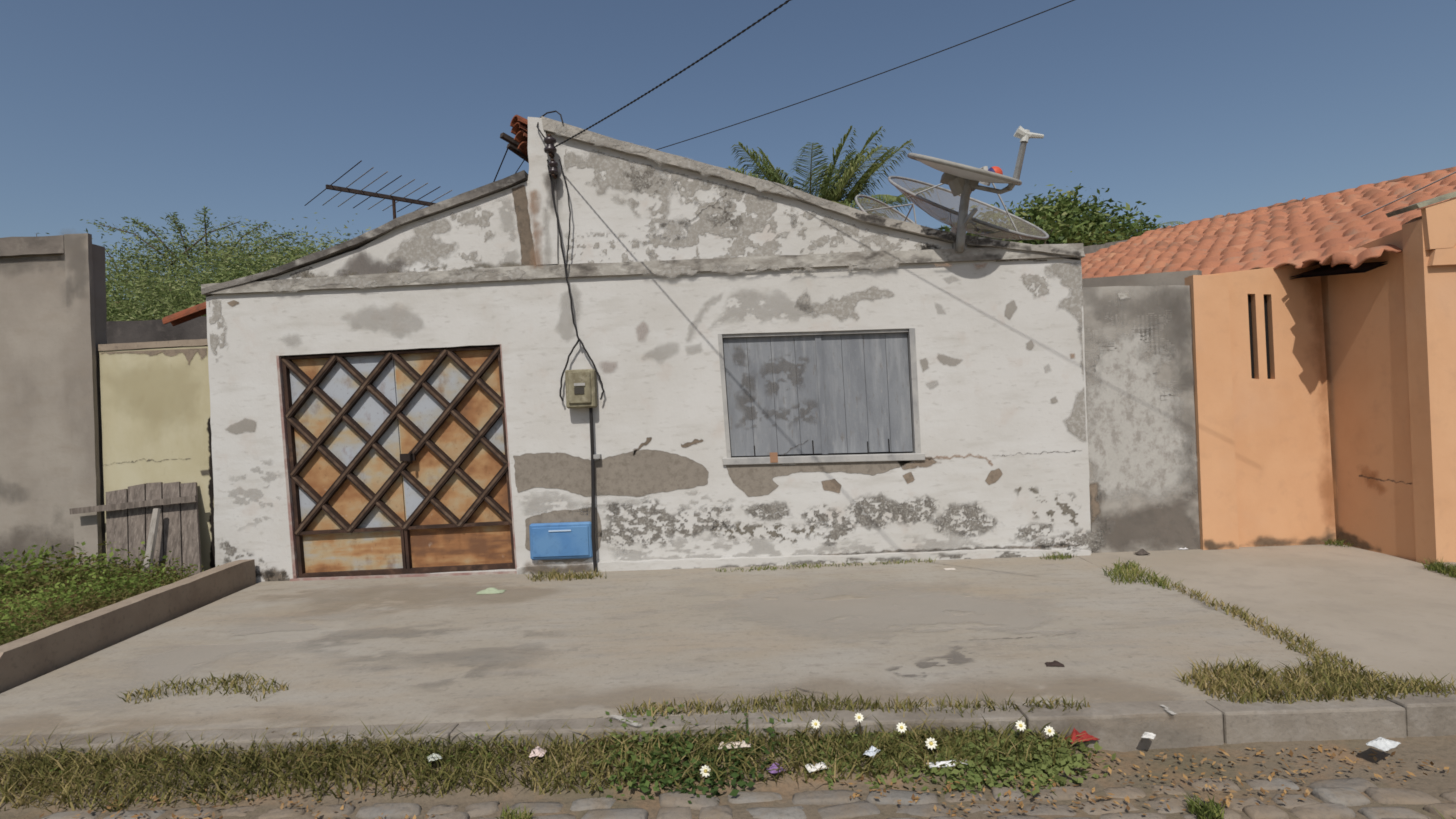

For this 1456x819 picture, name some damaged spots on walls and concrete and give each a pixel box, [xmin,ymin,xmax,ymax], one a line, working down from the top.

peeling [555,150,938,320]
peeling [920,355,961,371]
peeling [226,419,256,434]
spalling [726,452,936,497]
spalling [985,469,1002,485]
spalling [513,437,709,563]
peeling [221,542,284,581]